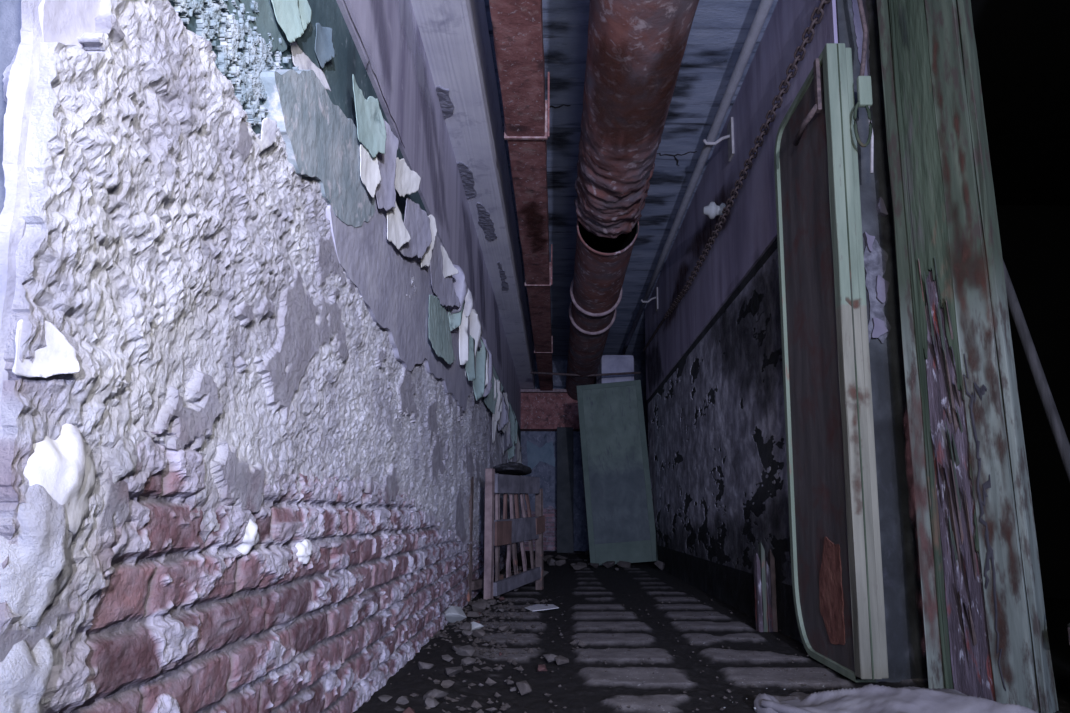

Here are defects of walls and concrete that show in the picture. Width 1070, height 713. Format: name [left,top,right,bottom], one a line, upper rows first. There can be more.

flaking render [0,0,557,713]